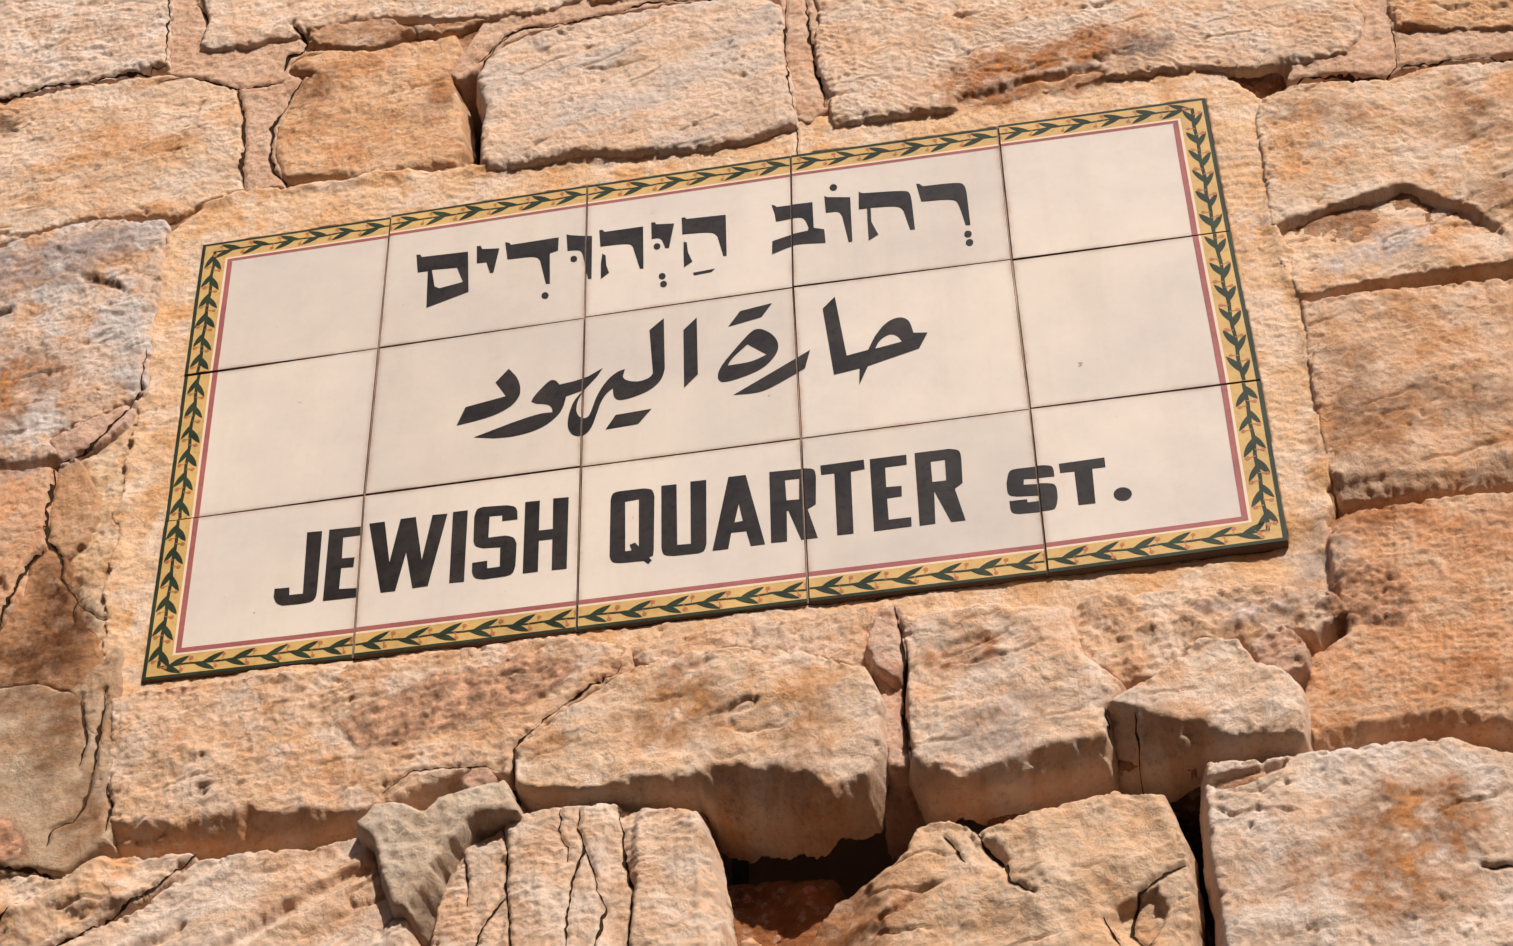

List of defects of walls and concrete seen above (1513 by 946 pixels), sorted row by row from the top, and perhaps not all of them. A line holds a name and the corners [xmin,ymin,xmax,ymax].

crack [0,691,114,920]
crack [383,665,634,946]
crack [56,854,197,946]
crack [1103,865,1186,946]
crack [1482,863,1513,871]